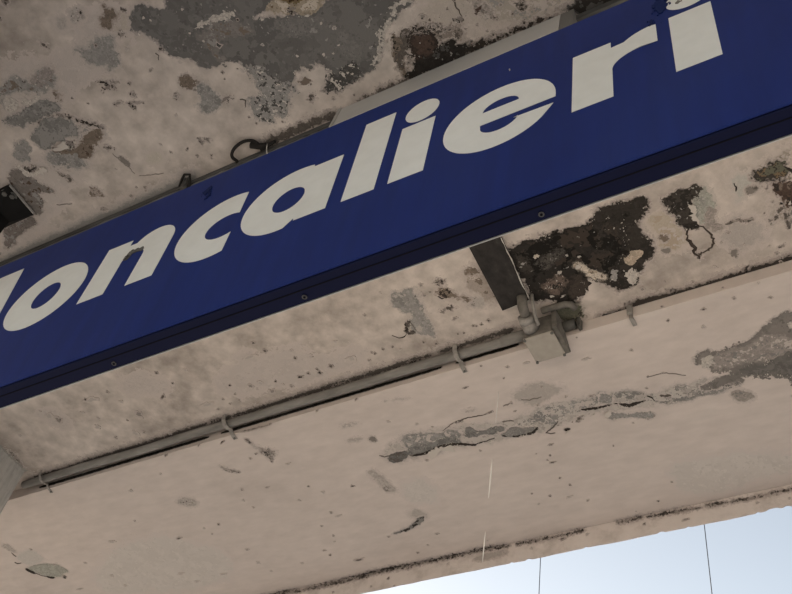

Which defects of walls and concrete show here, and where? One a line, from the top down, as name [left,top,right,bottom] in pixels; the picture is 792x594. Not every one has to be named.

peeling [116,0,469,127]
water stain [396,0,611,80]
peeling [0,66,107,251]
water stain [0,150,95,258]
peeling [610,250,643,285]
peeling [688,204,700,225]
crack [684,226,715,259]
peeling [377,309,792,465]
flaking render [27,562,70,579]
water stain [87,530,238,594]